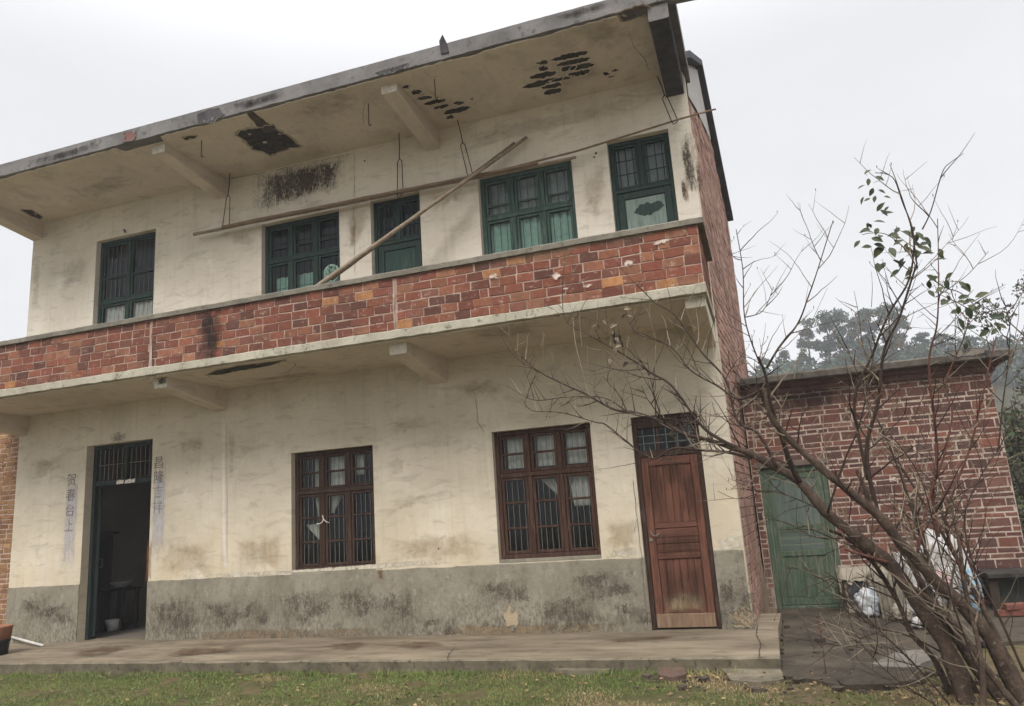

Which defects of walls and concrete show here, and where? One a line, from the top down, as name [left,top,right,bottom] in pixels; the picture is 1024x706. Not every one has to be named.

spalling [520,50,620,96]
spalling [401,84,475,120]
spalling [234,112,303,157]
water stain [261,161,339,206]
spalling [204,359,287,382]